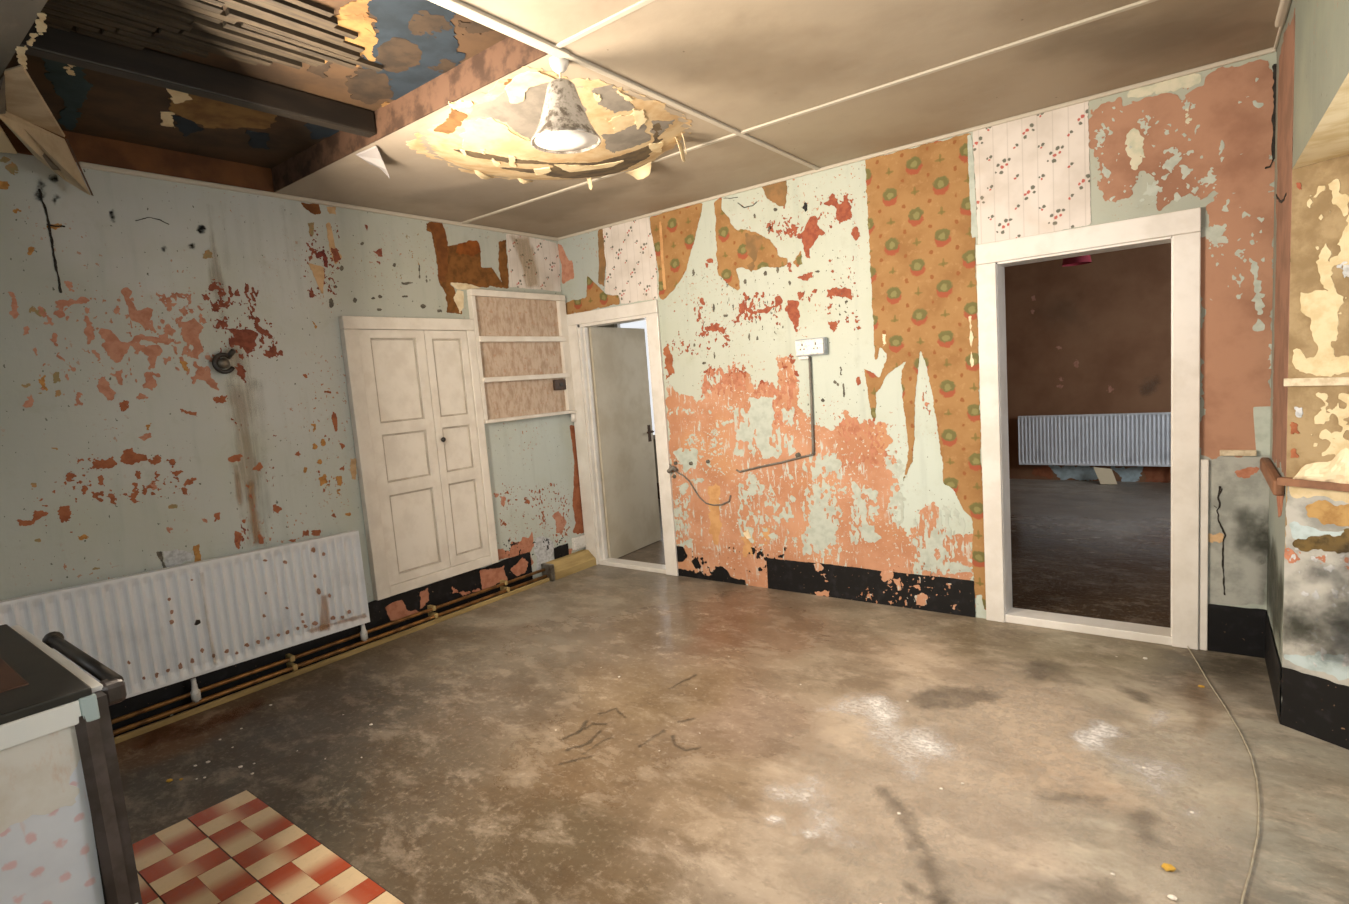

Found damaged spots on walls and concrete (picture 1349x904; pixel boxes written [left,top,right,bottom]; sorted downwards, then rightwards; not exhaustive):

peeling [334,0,494,107]
peeling [160,88,277,149]
crack [38,189,65,293]
peeling [301,203,442,312]
peeling [8,279,283,412]
peeling [662,181,973,610]
peeling [1088,8,1349,686]
peeling [17,423,197,542]
peeling [228,454,282,549]
peeling [295,412,357,518]
crack [1214,486,1226,595]
damp [1201,456,1349,651]